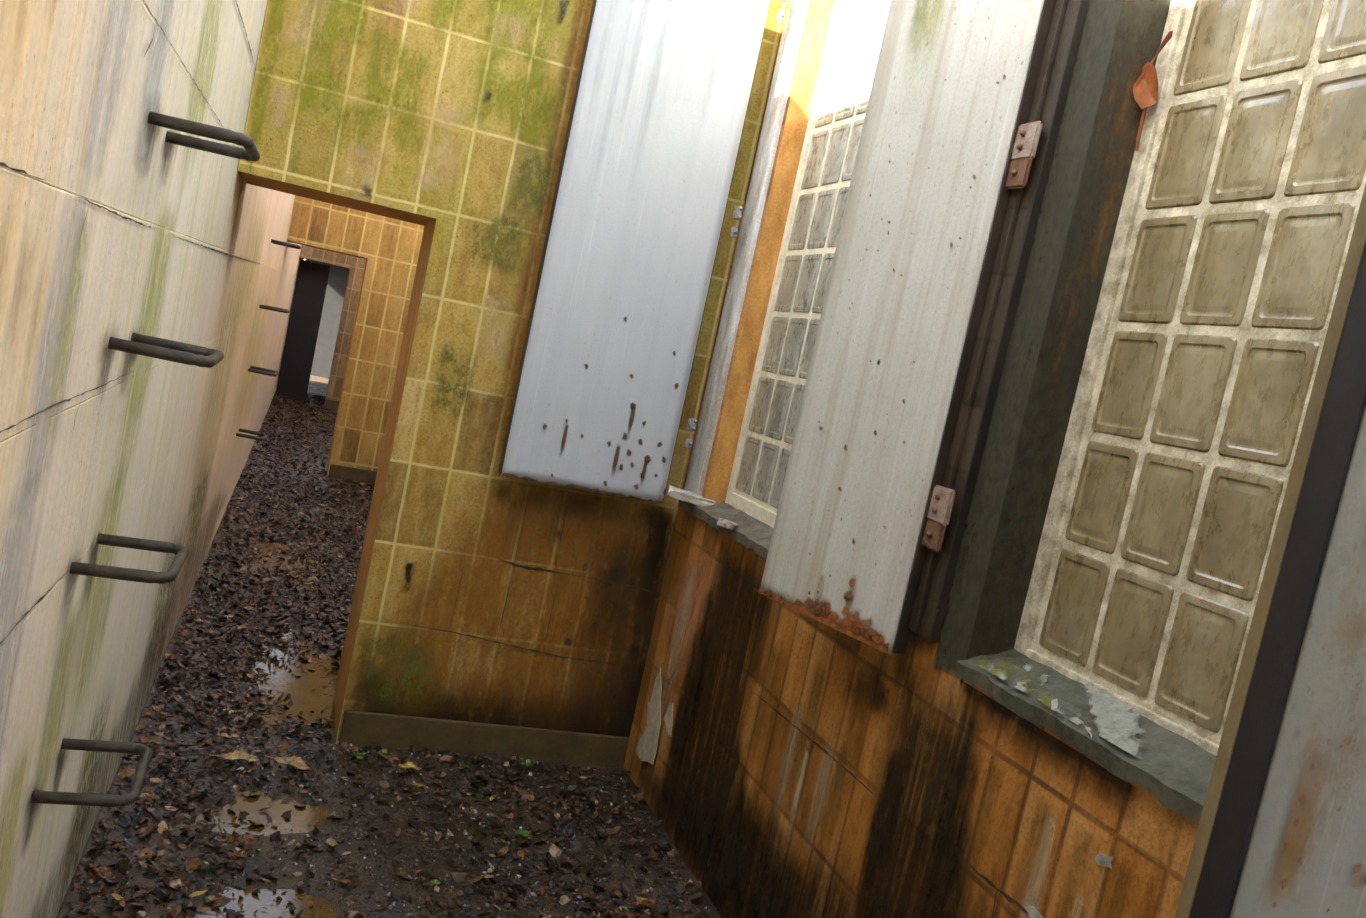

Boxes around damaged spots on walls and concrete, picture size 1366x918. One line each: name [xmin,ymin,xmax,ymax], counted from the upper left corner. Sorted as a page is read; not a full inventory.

crack [0,162,45,180]
crack [77,197,260,264]
corrosion [502,403,666,503]
damp [364,0,1171,918]
corrosion [756,579,889,653]
flaking render [635,668,673,765]